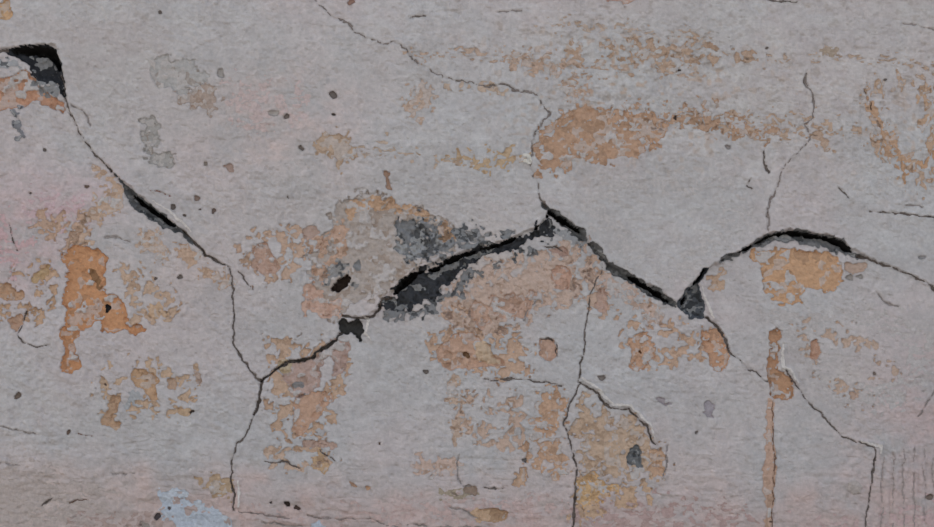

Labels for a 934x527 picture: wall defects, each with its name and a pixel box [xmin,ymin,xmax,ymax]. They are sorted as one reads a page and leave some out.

spalling [0,57,66,141]
peeling [400,14,934,200]
spalling [0,164,237,374]
crack [0,44,478,527]
spalling [233,171,515,324]
crack [315,0,934,527]
spalling [749,246,868,306]
spalling [90,353,204,431]
spalling [262,333,353,474]
peeling [383,228,730,523]
spalling [766,328,799,400]
peeling [790,317,902,408]